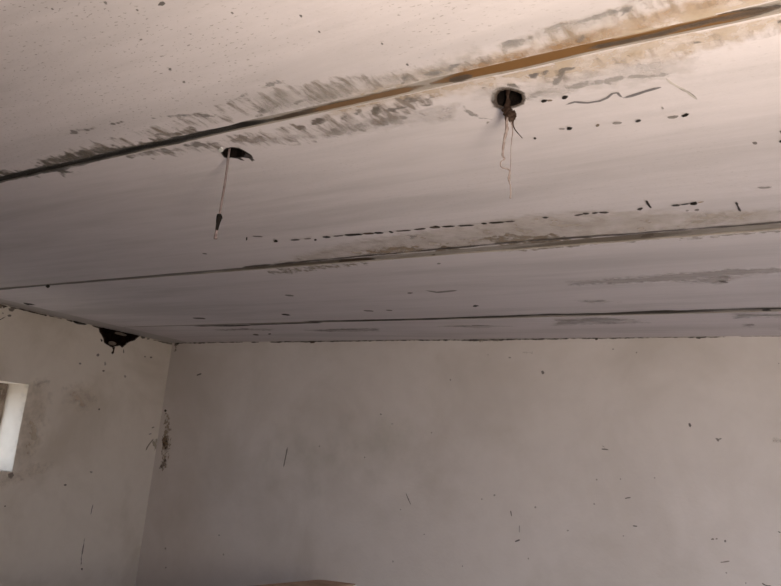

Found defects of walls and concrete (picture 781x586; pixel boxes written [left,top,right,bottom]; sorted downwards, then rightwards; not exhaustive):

leakage [577,6,633,23]
leakage [553,68,666,89]
leakage [281,109,365,142]
leakage [372,97,429,126]
leakage [37,114,219,177]
leakage [480,233,596,251]
hole [98,327,139,354]
leakage [146,409,171,471]